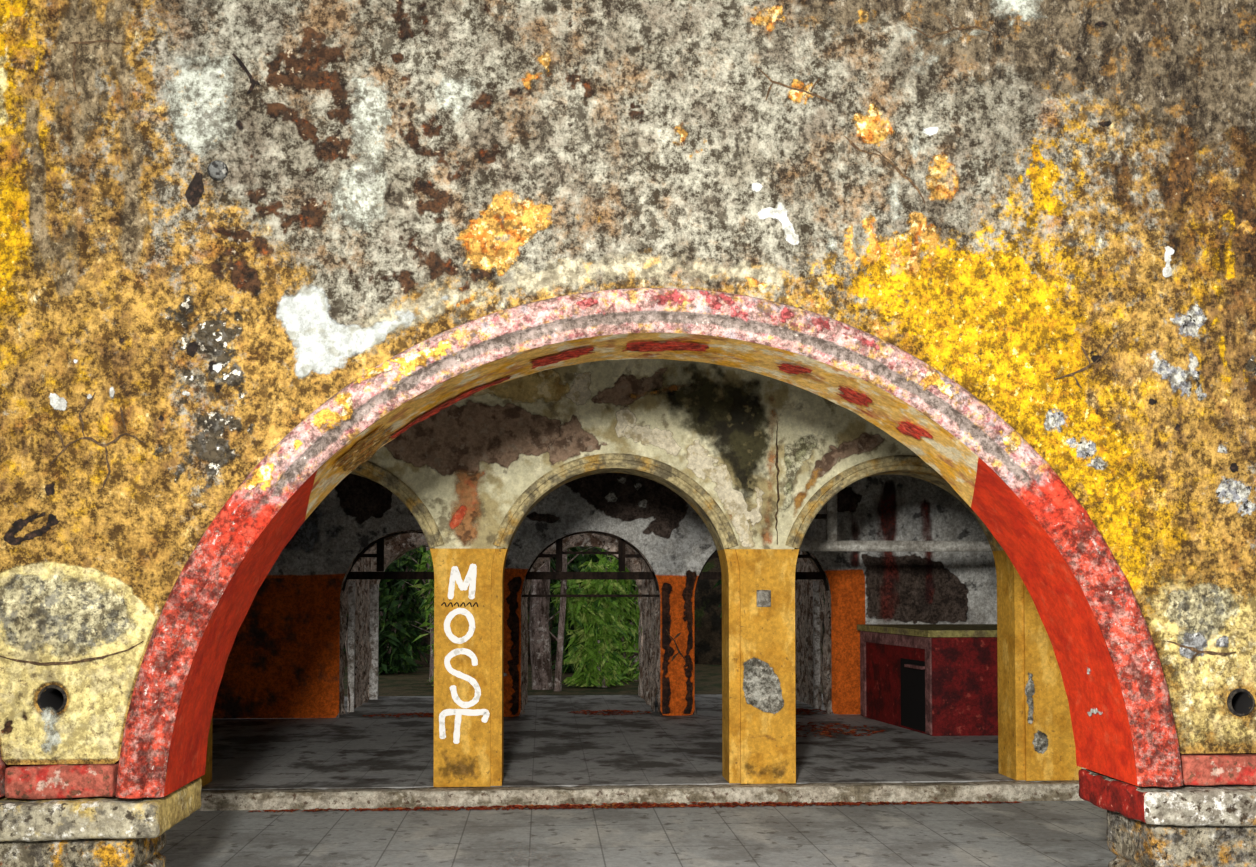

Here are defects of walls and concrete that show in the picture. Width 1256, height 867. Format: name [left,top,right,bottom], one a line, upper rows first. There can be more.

peeling [1211,210,1255,297]
peeling [156,0,1147,591]
spalling [1150,350,1206,401]
spalling [1170,304,1248,396]
damp [547,415,607,465]
damp [591,364,771,500]
spalling [1216,445,1256,516]
peeling [862,554,968,624]
peeling [743,658,784,714]